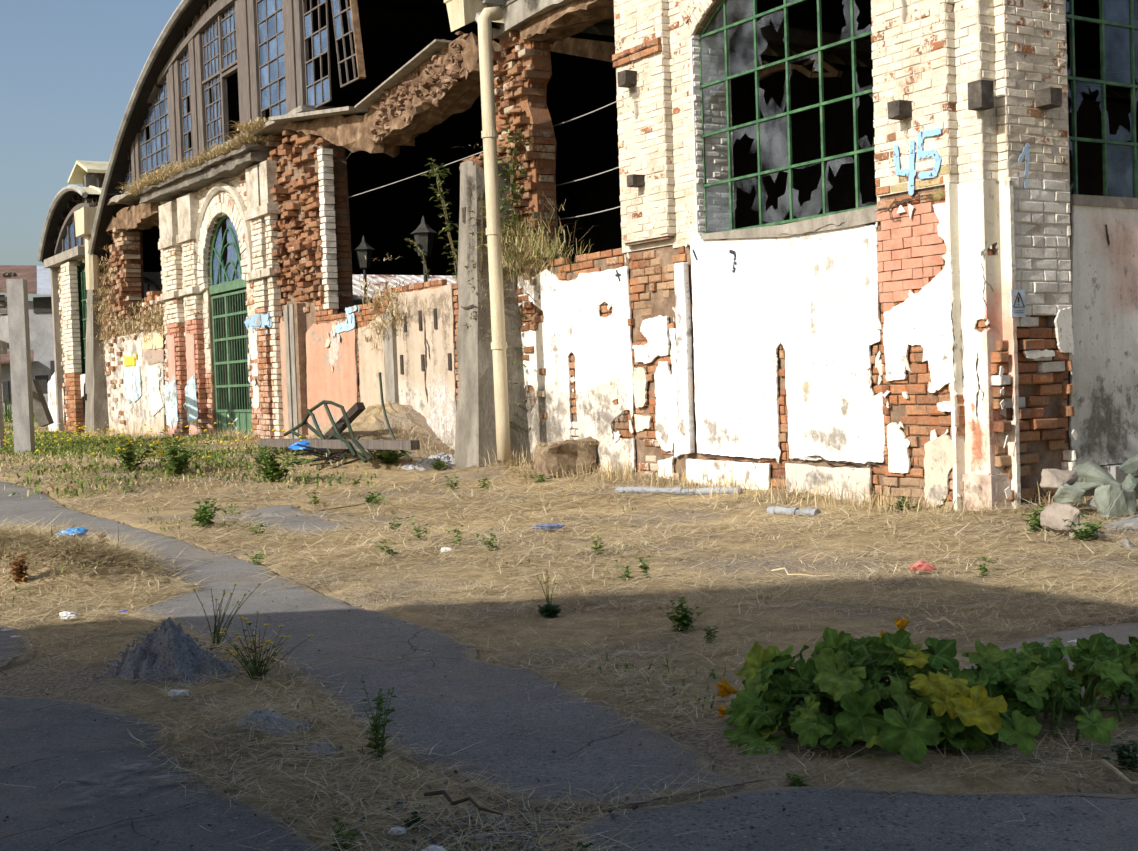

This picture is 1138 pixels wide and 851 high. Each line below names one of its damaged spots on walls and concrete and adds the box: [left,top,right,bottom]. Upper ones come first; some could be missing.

peeling [123,327,198,428]
spalling [611,243,688,480]
damp [704,419,738,443]
damp [804,427,846,449]
spalling [865,202,966,511]
spalling [991,317,1078,505]
damp [1080,379,1128,456]